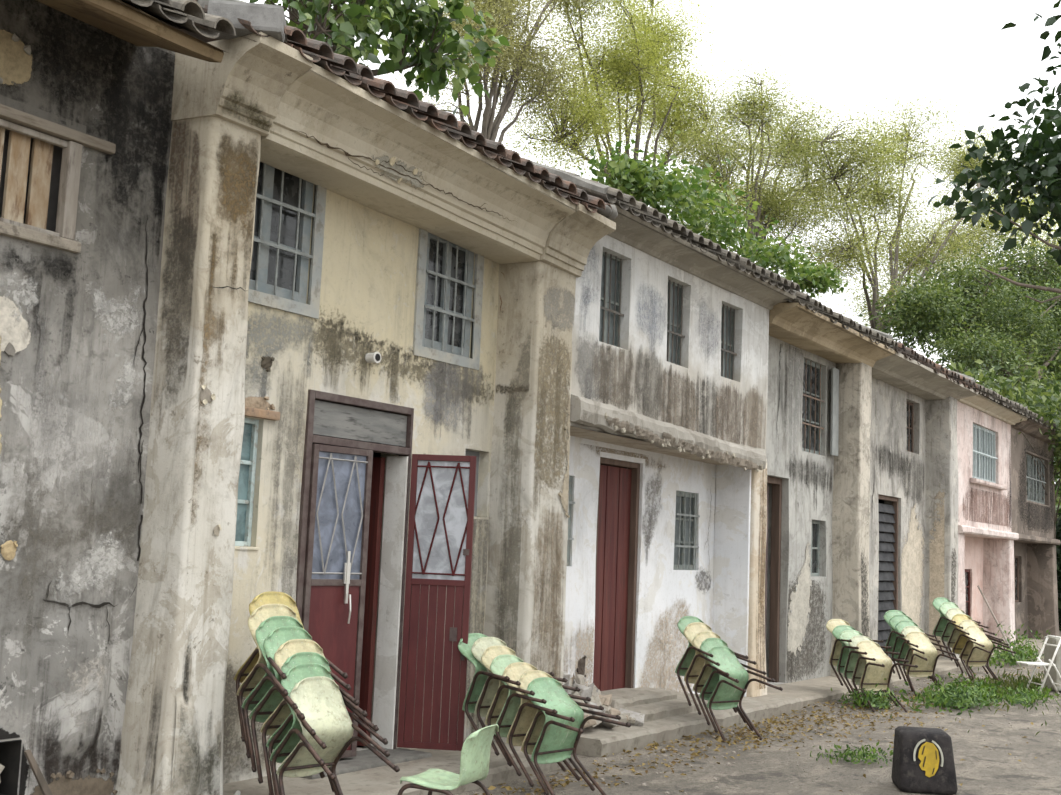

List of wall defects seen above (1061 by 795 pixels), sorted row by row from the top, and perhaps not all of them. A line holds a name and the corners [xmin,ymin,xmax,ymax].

flaking render [0,30,33,85]
damp [4,0,199,394]
crack [273,130,518,223]
flaking render [0,294,31,365]
crack [43,218,148,642]
damp [110,357,137,407]
damp [245,288,746,651]
spalling [604,413,763,472]
damp [533,515,563,677]
damp [786,580,828,682]